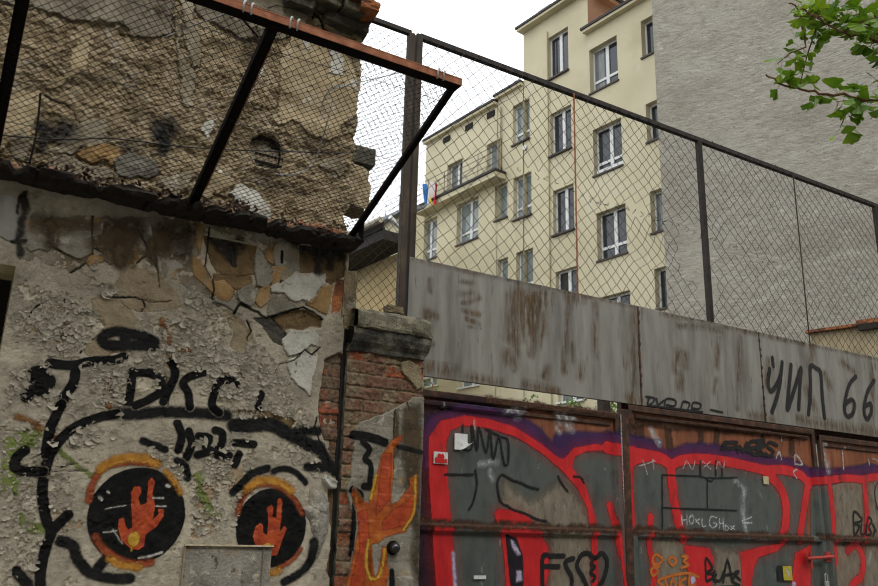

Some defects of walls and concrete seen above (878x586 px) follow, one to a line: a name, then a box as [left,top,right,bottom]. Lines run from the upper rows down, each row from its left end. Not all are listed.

flaking render [29,0,265,109]
flaking render [47,119,197,196]
flaking render [202,169,272,219]
flaking render [318,154,348,177]
corrosion [506,280,548,367]
flaking render [0,215,424,586]
corrosion [420,517,622,534]
corrosion [634,525,878,544]